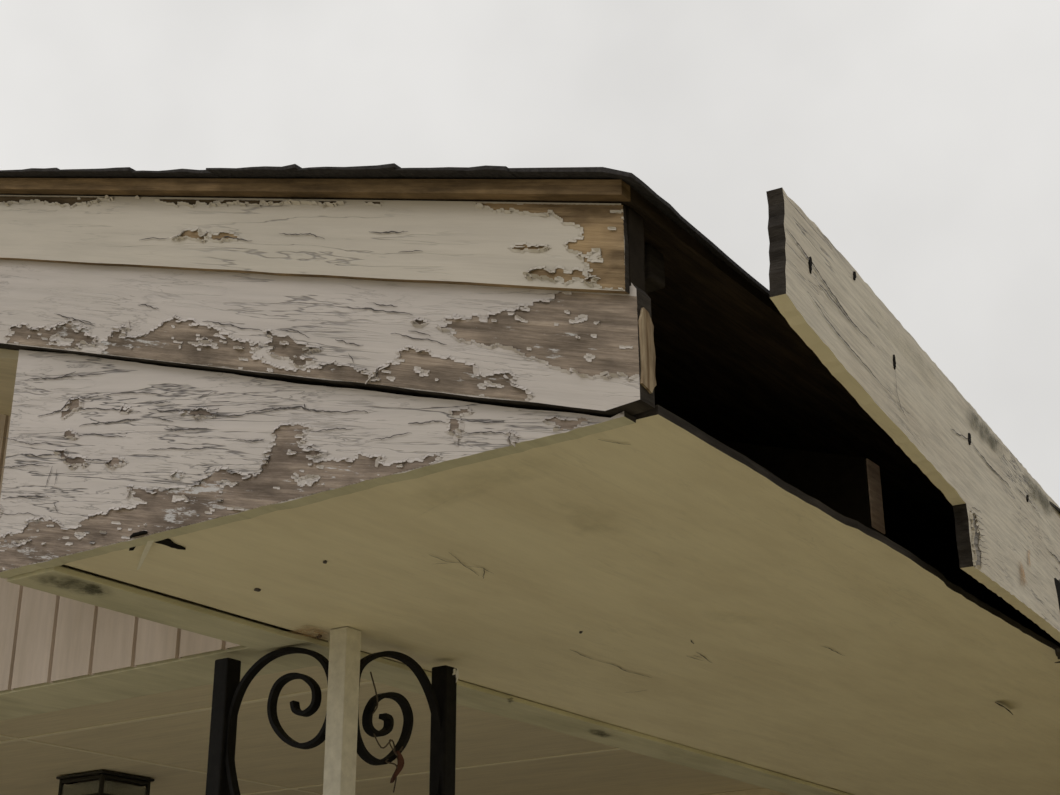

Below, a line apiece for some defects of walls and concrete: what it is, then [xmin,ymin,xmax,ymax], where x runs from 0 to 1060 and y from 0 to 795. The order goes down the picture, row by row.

peeling [0,195,114,209]
peeling [170,227,240,243]
peeling [153,199,346,209]
peeling [410,203,639,382]
peeling [4,315,536,447]
peeling [53,396,91,470]
peeling [0,421,444,572]